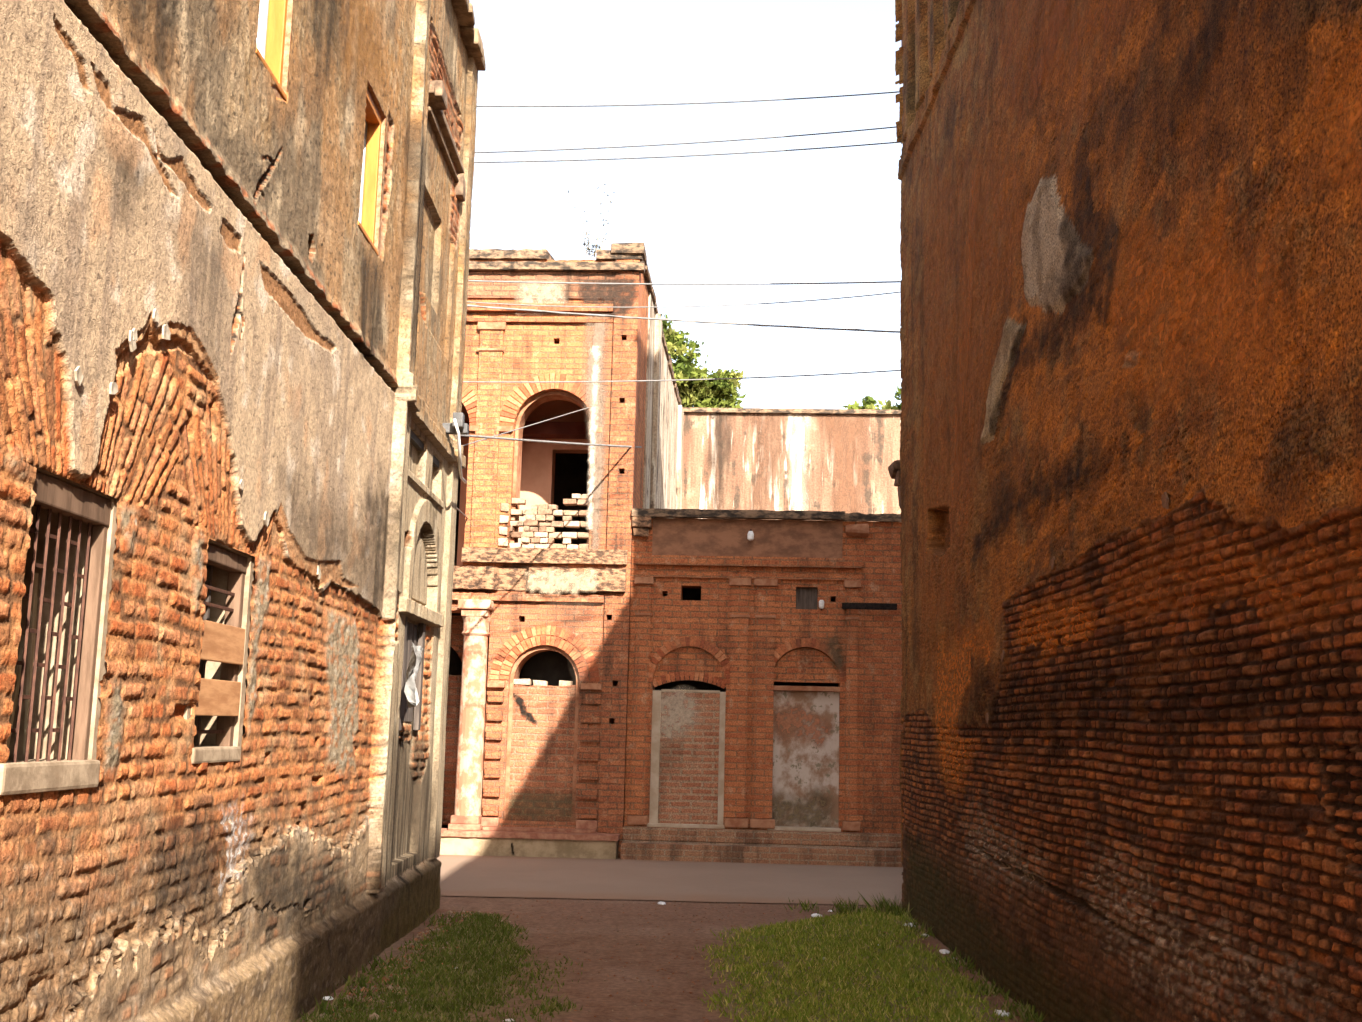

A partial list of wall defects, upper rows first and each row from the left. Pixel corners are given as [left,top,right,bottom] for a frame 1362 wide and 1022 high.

peeling [52,12,243,256]
crack [253,145,284,204]
water stain [353,258,376,357]
water stain [989,138,1118,434]
water stain [709,414,730,494]
water stain [751,413,780,510]
water stain [824,414,864,513]
spalling [0,230,440,1022]
spalling [899,487,1362,1022]
water stain [772,791,830,827]
water stain [259,858,335,920]